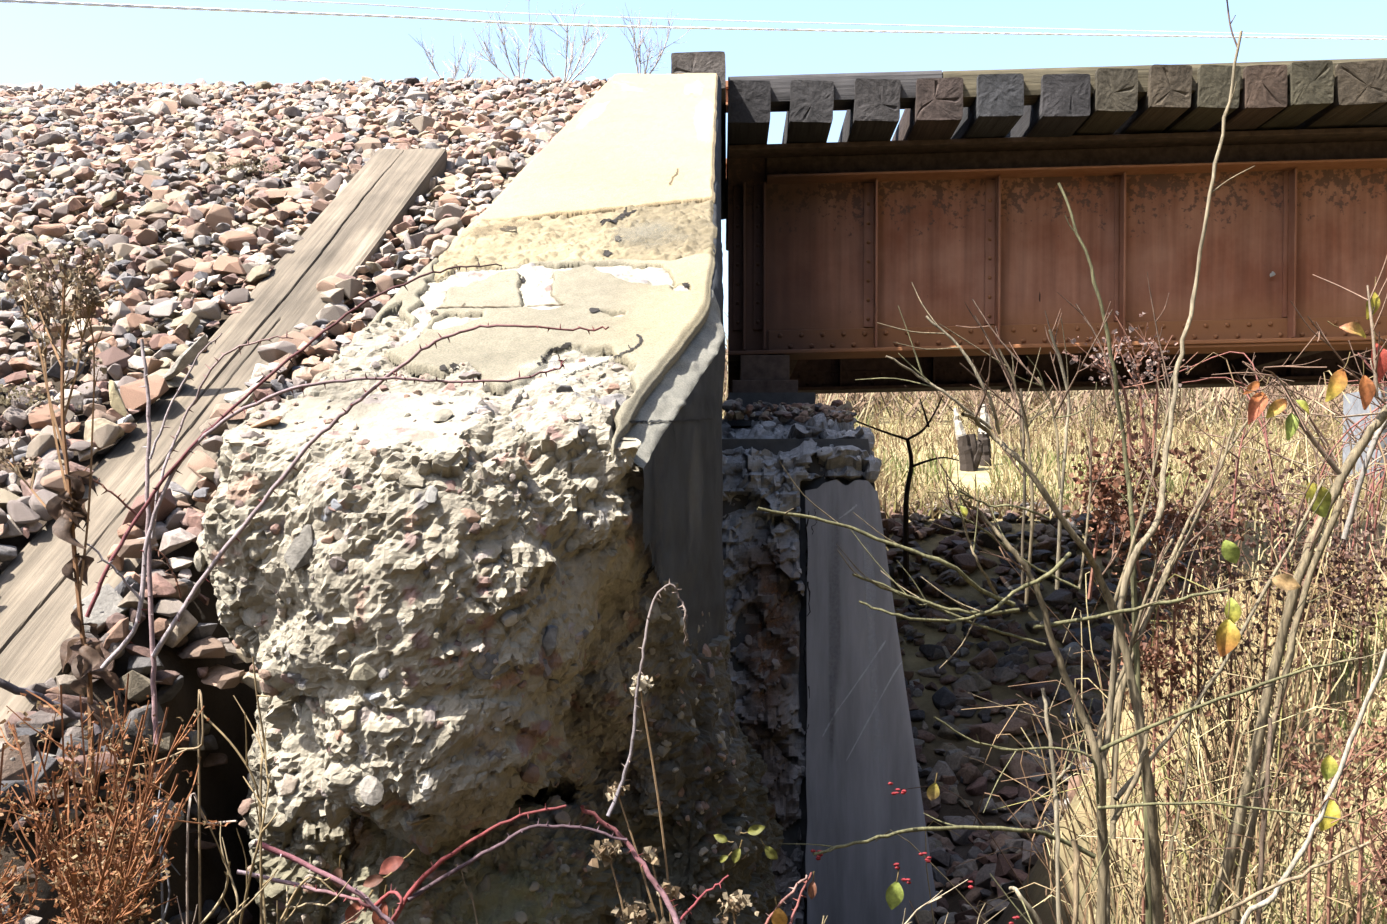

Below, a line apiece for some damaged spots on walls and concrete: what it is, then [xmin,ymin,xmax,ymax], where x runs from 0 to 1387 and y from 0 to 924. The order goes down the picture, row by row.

crack [436,301,565,309]
crack [511,334,643,411]
spalling [194,263,882,924]